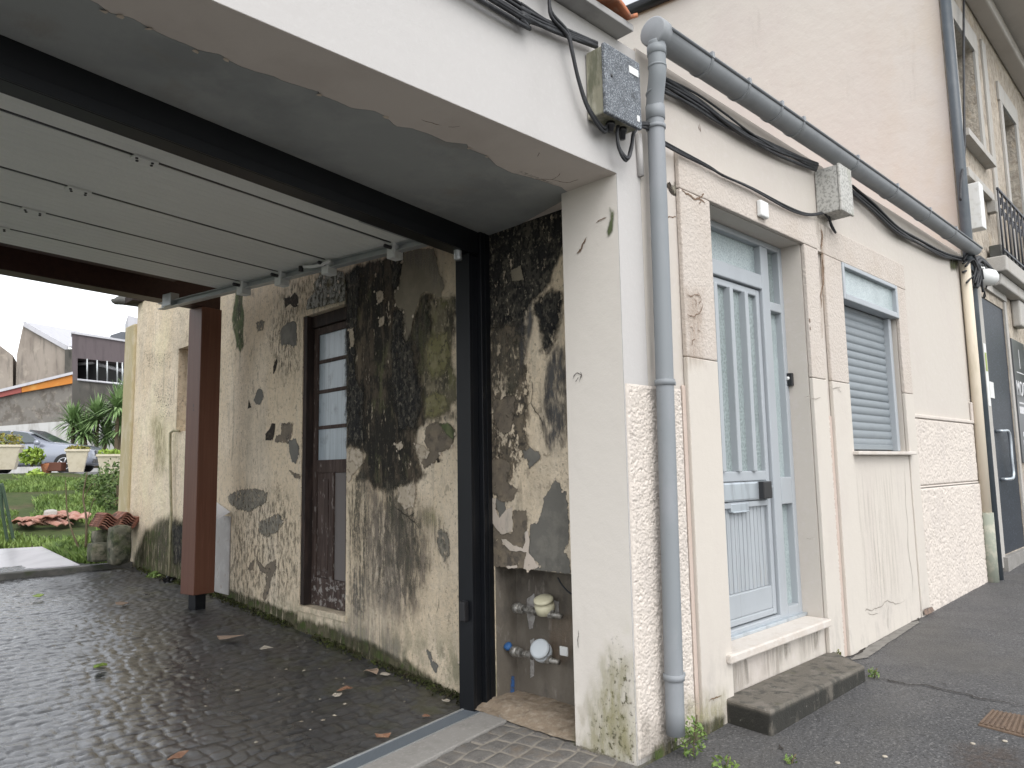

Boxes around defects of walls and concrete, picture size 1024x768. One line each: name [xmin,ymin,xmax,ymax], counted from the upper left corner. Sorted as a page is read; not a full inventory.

peeling [0,0,567,235]
crack [668,190,705,218]
damp [489,209,567,449]
flaking render [264,422,300,479]
damp [345,252,450,615]
flaking render [414,422,456,469]
flaking render [490,325,571,574]
flaking render [216,489,284,538]
damp [158,522,182,564]
damp [342,636,399,669]
damp [591,658,634,763]